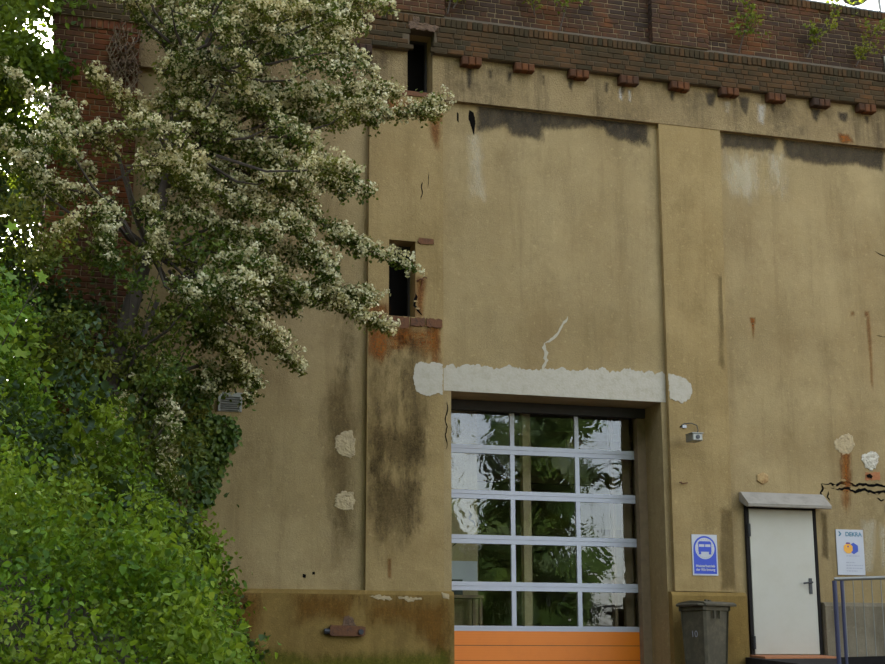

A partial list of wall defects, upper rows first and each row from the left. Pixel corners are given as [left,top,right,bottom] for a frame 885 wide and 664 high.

rust [368,328,439,362]
crack [542,316,568,373]
peeling [335,430,356,458]
spalling [834,433,855,455]
peeling [334,491,356,510]
rust [840,453,851,506]
crack [820,479,885,501]
spalling [861,451,881,481]